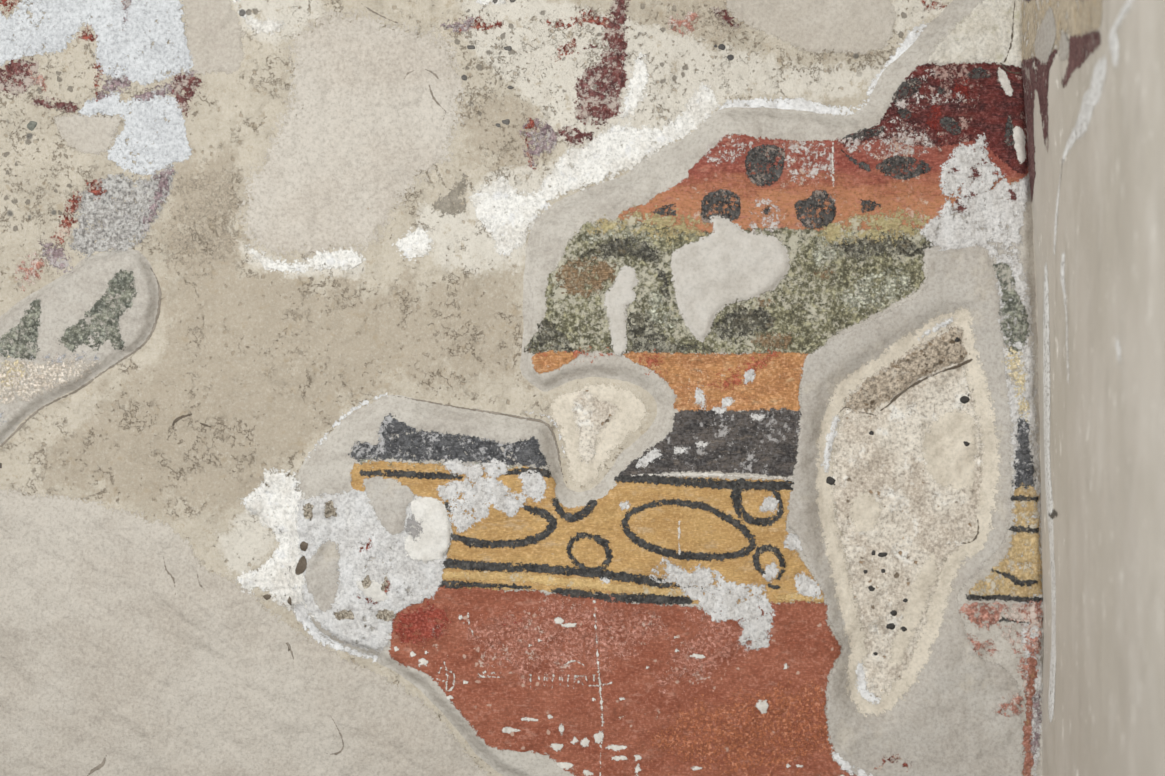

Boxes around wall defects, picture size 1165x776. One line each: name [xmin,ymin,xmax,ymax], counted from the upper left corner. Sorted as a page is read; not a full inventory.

spalling [546,382,650,487]
spalling [814,306,1003,717]
spalling [235,468,453,667]
peeling [554,617,577,628]
peeling [501,714,642,776]
peeling [755,700,769,714]